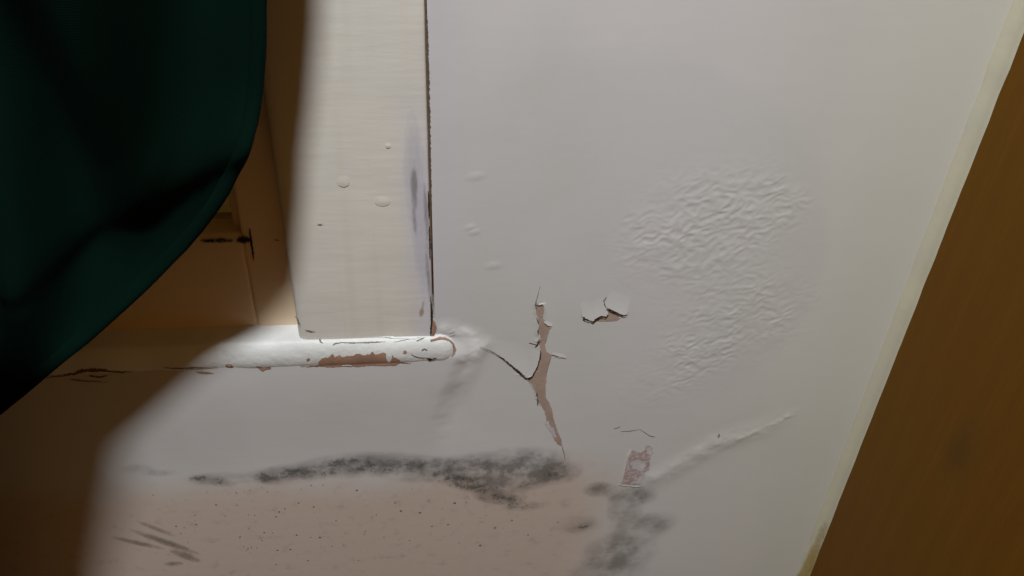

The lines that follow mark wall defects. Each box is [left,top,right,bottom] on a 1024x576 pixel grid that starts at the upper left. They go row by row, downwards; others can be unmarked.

peeling [581,291,631,321]
peeling [301,350,410,367]
spalling [619,446,653,487]